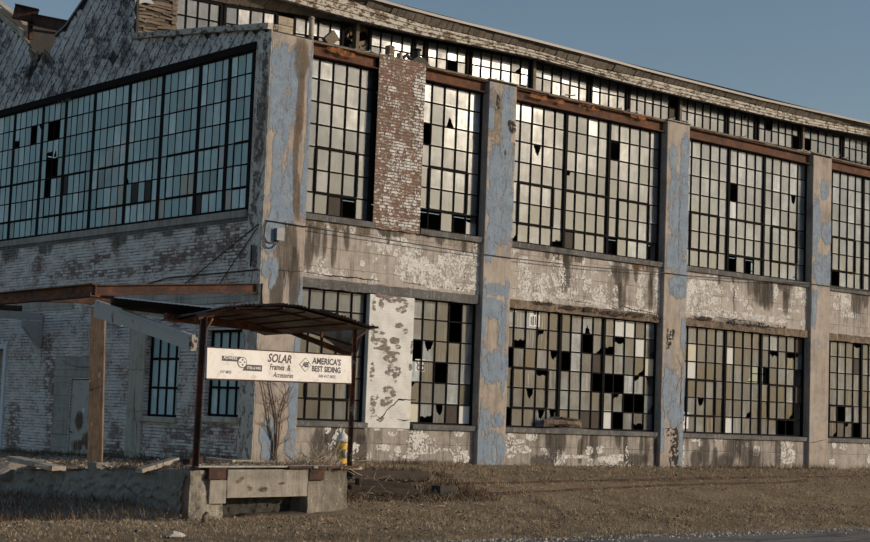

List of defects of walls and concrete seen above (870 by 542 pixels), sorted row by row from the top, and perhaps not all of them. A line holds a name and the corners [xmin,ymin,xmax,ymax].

water stain [271,39,403,305]
peeling [33,38,860,468]
water stain [545,252,582,288]
water stain [611,261,638,310]
water stain [748,279,790,312]
crack [379,399,416,423]